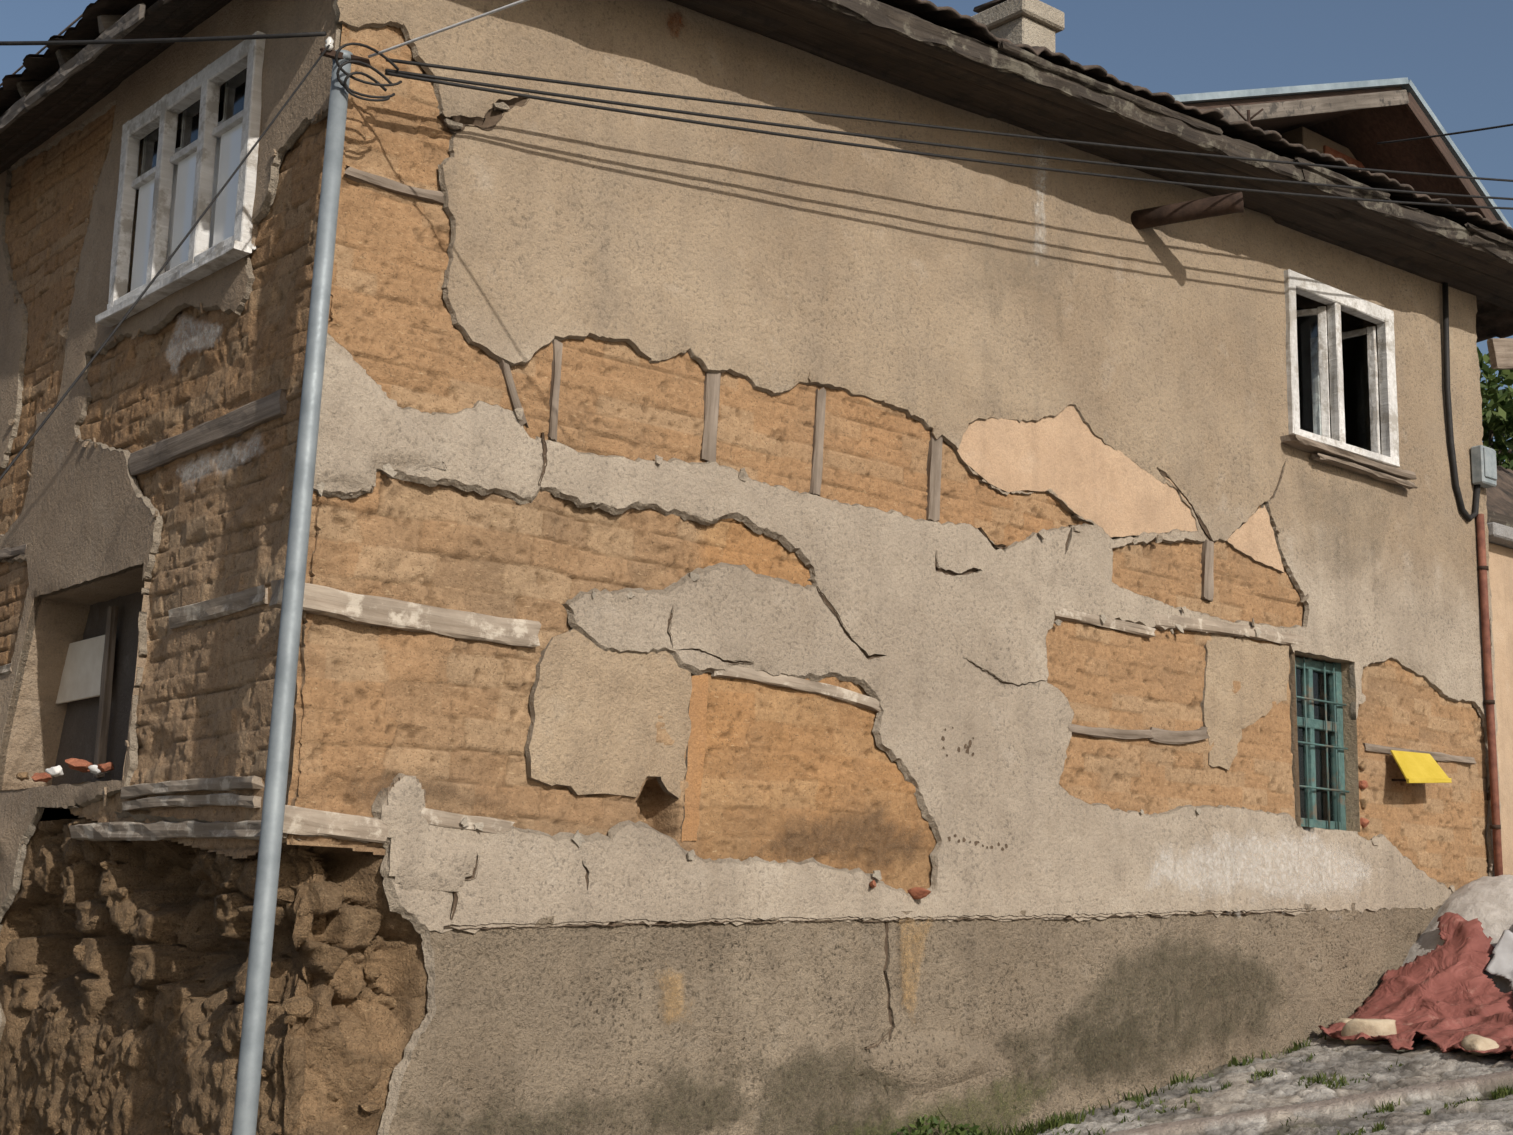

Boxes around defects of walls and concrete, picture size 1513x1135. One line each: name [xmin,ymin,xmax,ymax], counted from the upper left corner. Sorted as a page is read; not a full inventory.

peeling [0,98,117,675]
peeling [70,109,328,859]
peeling [282,21,1313,1135]
crack [816,586,887,660]
crack [1157,467,1214,542]
crack [1265,463,1286,504]
spalling [0,823,37,922]
crack [443,855,1316,1050]
peeling [1357,657,1494,894]